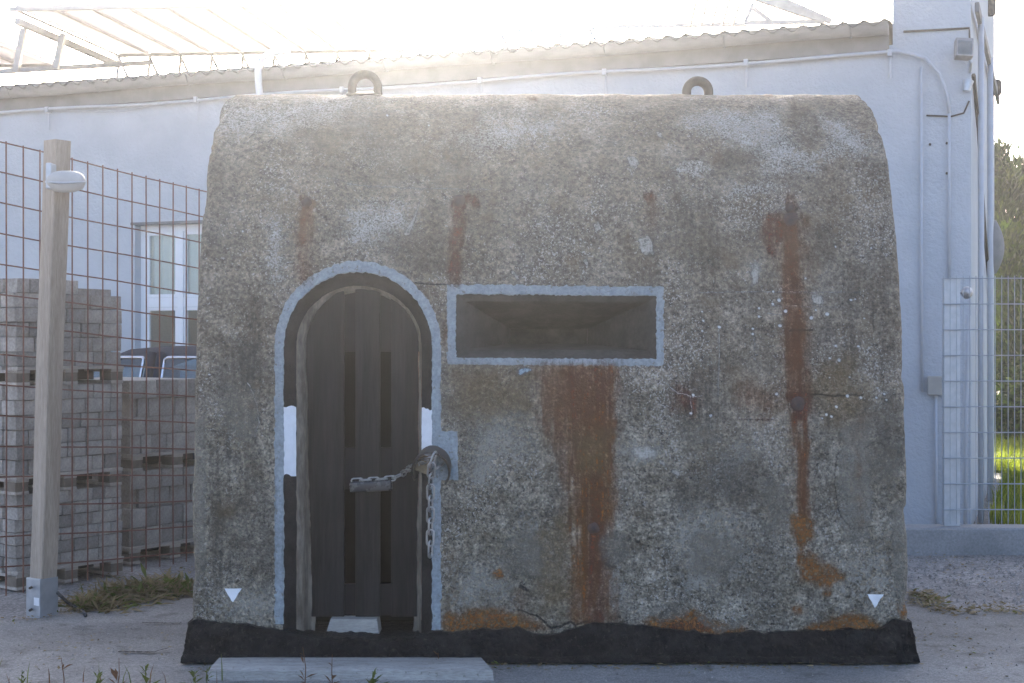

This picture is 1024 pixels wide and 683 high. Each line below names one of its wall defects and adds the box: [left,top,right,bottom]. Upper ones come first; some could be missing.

corrosion [448,194,480,289]
corrosion [739,195,843,596]
corrosion [442,608,545,632]
crack [517,590,587,629]
corrosion [644,609,744,635]
corrosion [804,614,880,631]